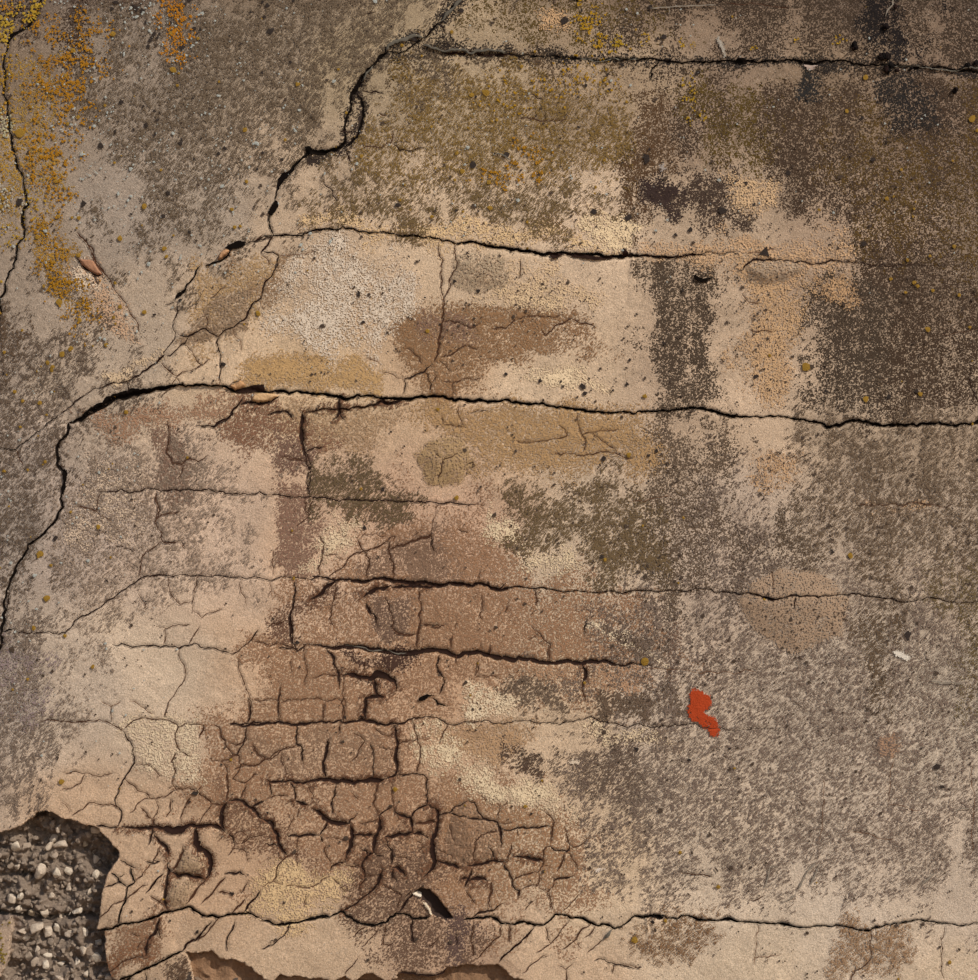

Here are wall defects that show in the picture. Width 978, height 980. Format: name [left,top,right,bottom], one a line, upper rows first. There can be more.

crack [653,2,789,14]
crack [275,5,978,200]
spalling [0,811,119,980]
spalling [188,950,522,980]